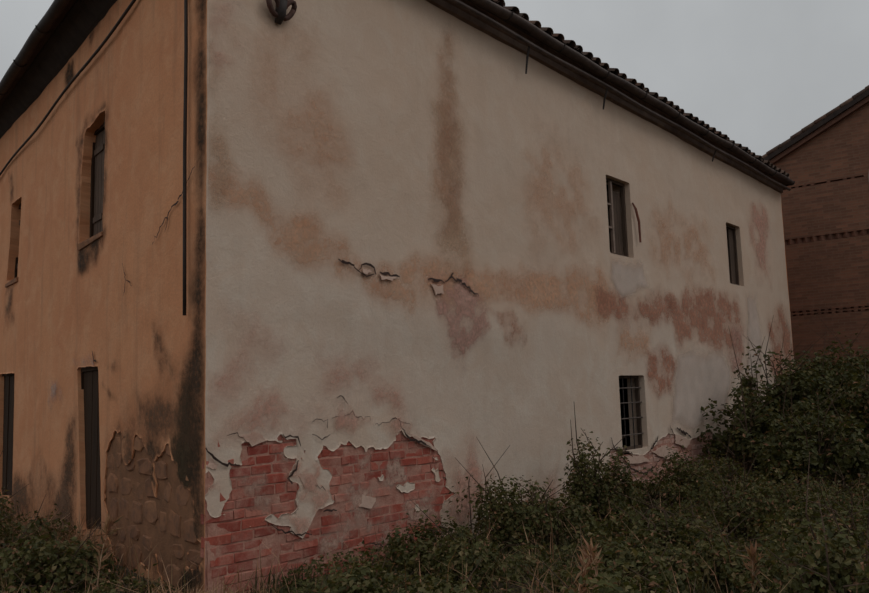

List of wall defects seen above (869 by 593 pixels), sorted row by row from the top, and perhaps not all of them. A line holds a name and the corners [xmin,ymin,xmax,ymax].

water stain [196,0,206,187]
water stain [77,229,105,273]
crack [152,167,194,244]
water stain [436,72,488,354]
water stain [139,208,205,539]
water stain [639,289,743,370]
water stain [46,420,74,538]
flaking render [105,417,454,593]
flaking render [609,426,713,487]
water stain [179,565,203,593]